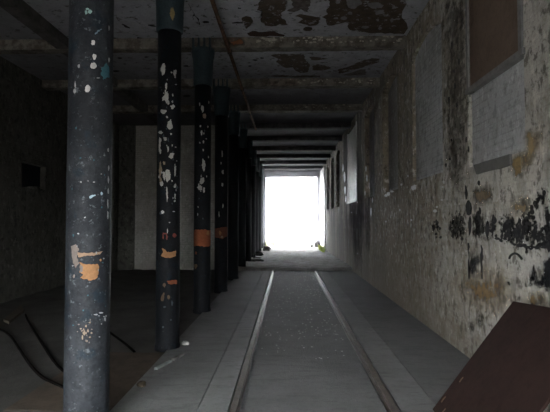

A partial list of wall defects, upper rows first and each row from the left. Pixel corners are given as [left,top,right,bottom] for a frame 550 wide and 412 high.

peeling [233,0,408,43]
peeling [271,54,330,84]
peeling [158,83,177,204]
leakage [465,185,490,239]
peeling [194,227,228,254]
peeling [71,241,105,281]
leakage [525,257,550,291]